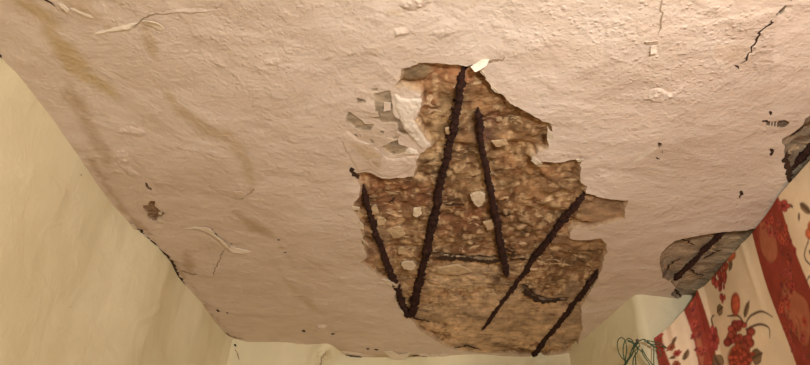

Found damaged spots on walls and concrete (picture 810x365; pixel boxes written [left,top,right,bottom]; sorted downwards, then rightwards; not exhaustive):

crack [35,0,217,34]
crack [709,0,792,72]
spalling [766,116,810,183]
spalling [342,57,629,357]
spalling [660,228,756,299]